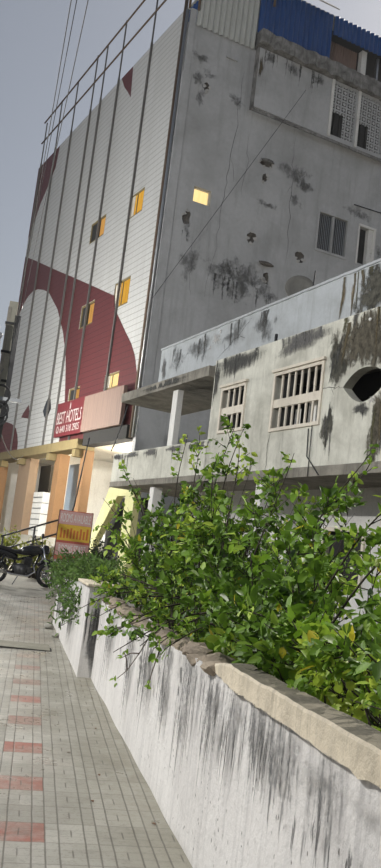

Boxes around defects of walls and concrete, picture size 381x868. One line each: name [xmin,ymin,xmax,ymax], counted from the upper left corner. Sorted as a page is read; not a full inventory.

spalling [258,160,273,183]
leakage [213,263,277,338]
leakage [282,252,381,388]
leakage [212,347,262,404]
leakage [320,404,333,456]
leakage [353,393,381,462]
leakage [84,602,114,673]
leakage [121,624,290,824]
leakage [307,759,332,862]